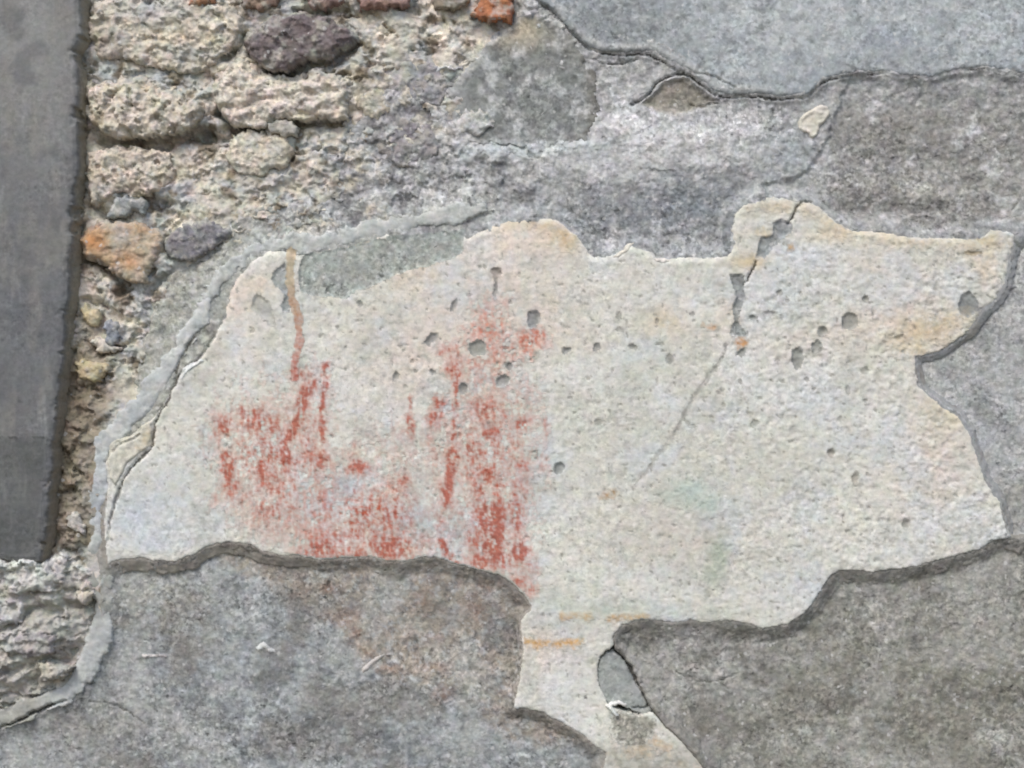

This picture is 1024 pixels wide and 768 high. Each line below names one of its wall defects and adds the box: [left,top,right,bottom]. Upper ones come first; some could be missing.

rust [285,246,305,381]
spalling [250,229,466,332]
flaking render [107,421,152,485]
flaking render [179,359,203,380]
peeling [190,267,571,601]
crack [634,344,728,485]
rust [287,576,339,599]
rust [318,603,458,706]
rust [450,576,510,633]